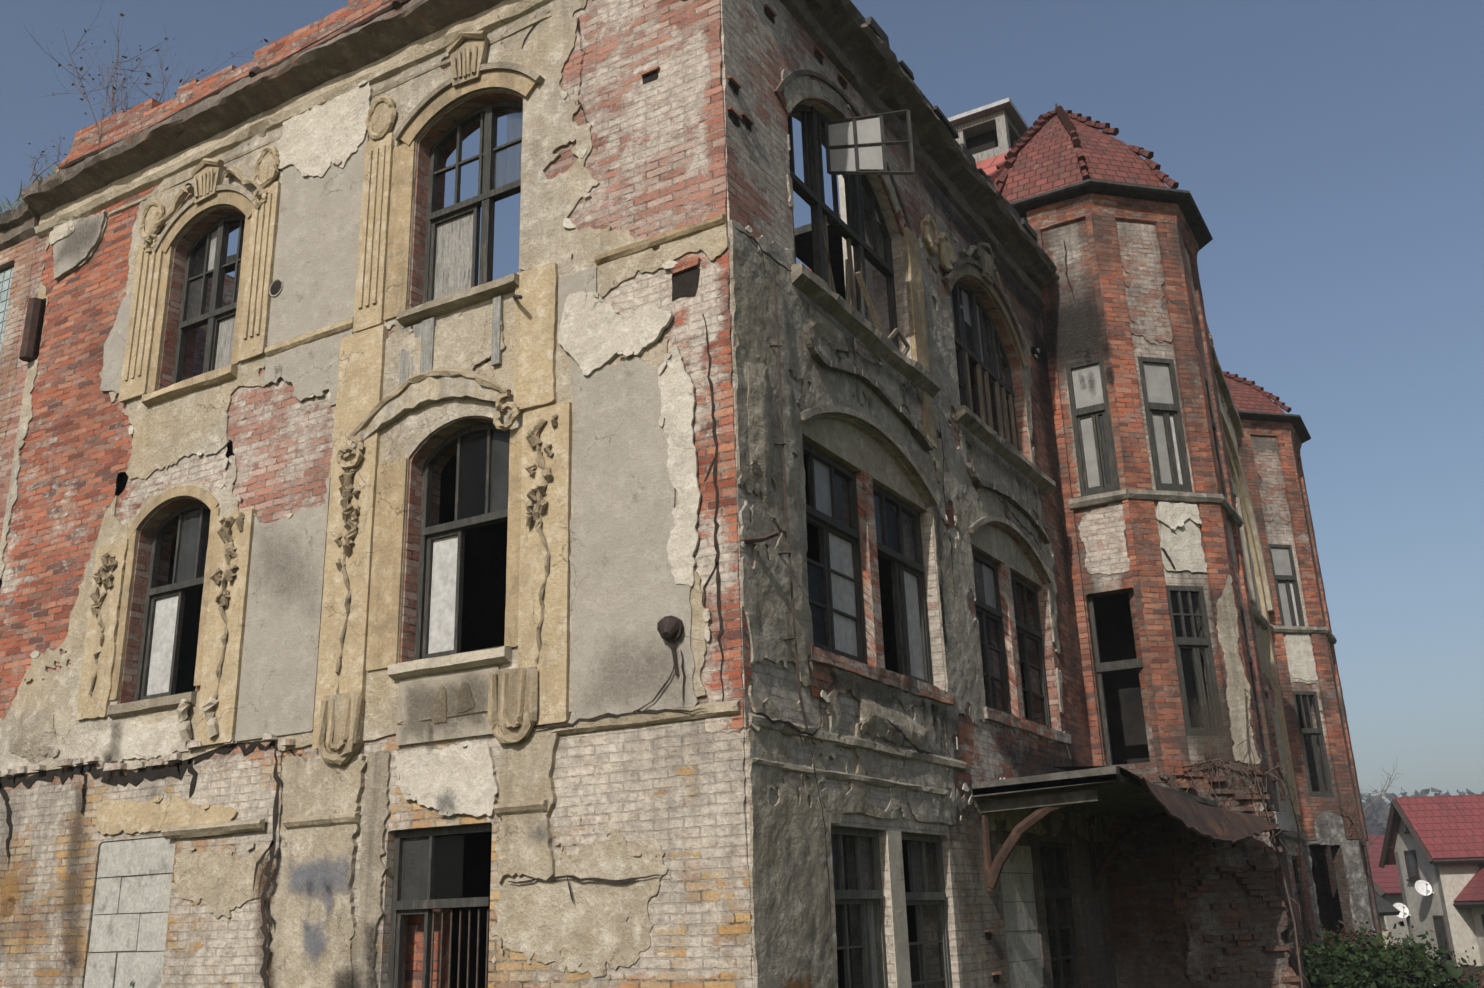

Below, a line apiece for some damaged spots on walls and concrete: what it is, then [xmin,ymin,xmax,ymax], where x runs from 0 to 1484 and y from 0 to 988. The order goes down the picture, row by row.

flaking render [0,183,334,719]
crack [508,314,831,919]
flaking render [558,0,1094,988]
peeling [1157,502,1202,530]
peeling [96,715,194,763]
crack [0,733,301,988]
peeling [396,741,499,817]
corrosion [1055,766,1279,844]
spalling [1159,754,1300,988]